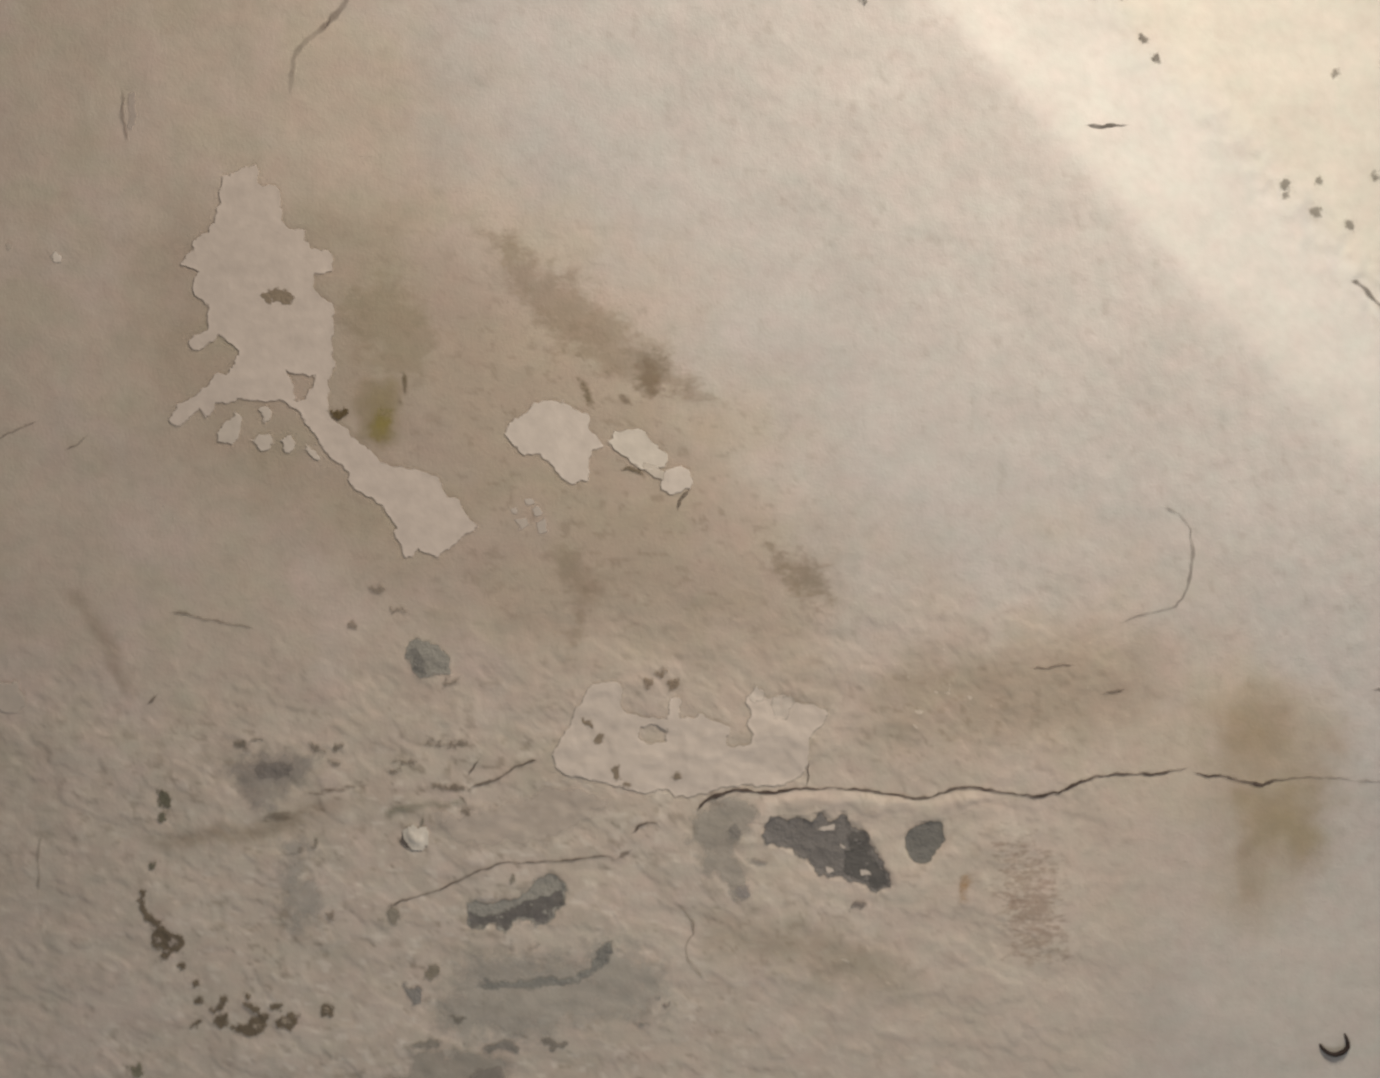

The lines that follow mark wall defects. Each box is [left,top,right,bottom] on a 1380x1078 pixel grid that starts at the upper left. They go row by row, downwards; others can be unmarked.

peeling [169,164,477,558]
peeling [505,400,693,507]
peeling [552,670,829,797]
crack [699,762,1287,809]
crack [395,856,606,905]
spalling [467,874,567,934]
spalling [762,812,891,908]
spalling [905,821,946,863]